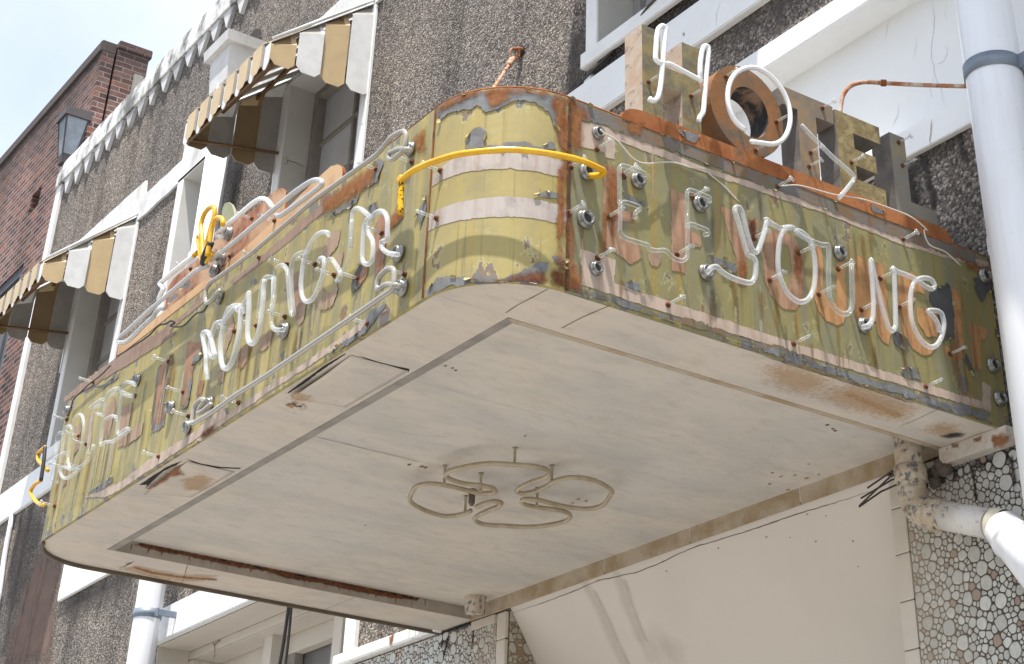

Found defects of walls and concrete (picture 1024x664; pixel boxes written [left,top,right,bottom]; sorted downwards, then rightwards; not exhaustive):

corrosion [440,88,589,291]
peeling [436,88,977,264]
peeling [426,256,570,297]
peeling [180,350,203,409]
spalling [926,459,953,490]
corrosion [131,543,426,604]
crack [515,492,869,612]